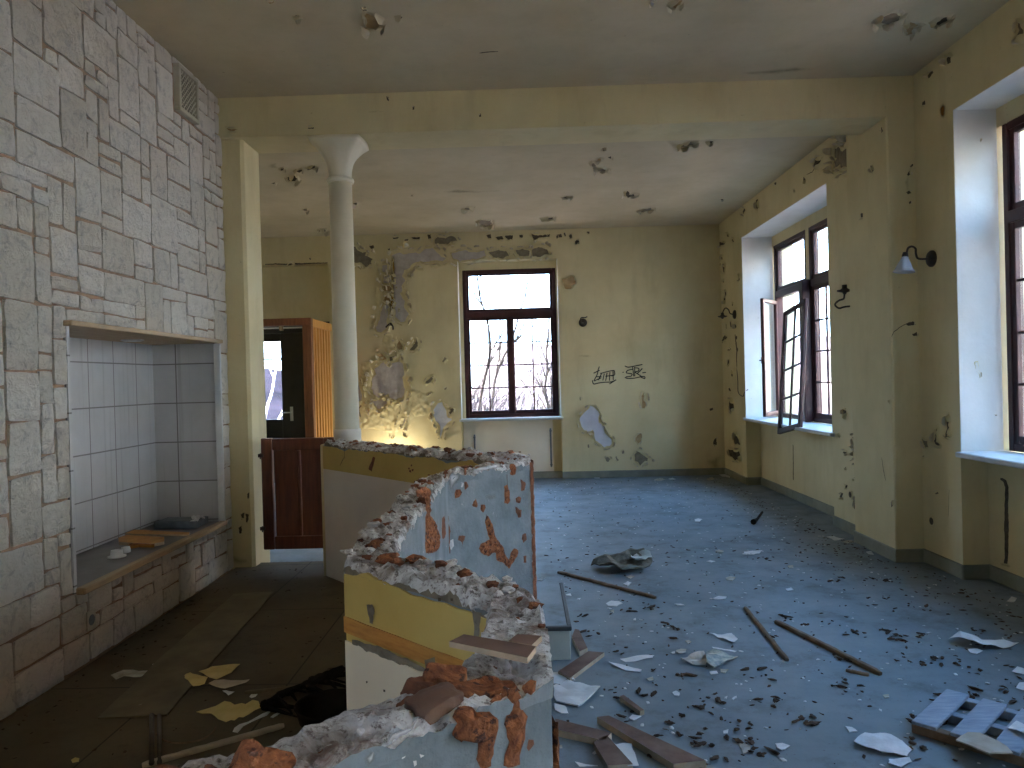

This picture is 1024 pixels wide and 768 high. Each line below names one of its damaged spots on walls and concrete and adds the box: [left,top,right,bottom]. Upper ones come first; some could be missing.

peeling [360,7,402,39]
peeling [871,9,956,41]
peeling [822,135,847,179]
peeling [354,206,589,441]
peeling [576,404,655,468]
flaking render [416,486,465,554]
flaking render [472,460,537,600]
spalling [352,640,536,768]